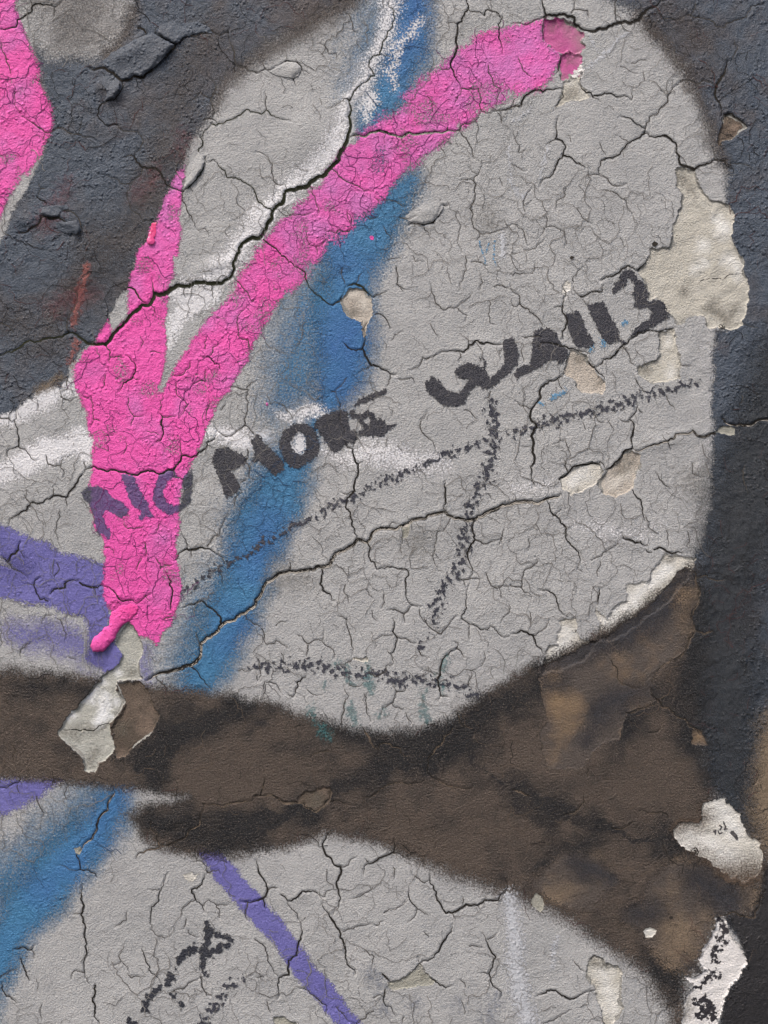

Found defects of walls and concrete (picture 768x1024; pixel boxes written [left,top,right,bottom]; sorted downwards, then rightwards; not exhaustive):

peeling [718,114,747,146]
peeling [340,288,373,337]
crack [0,0,768,809]
peeling [563,350,605,395]
peeling [560,450,641,498]
spalling [637,167,749,384]
spalling [58,603,160,773]
crack [0,716,605,1024]
peeling [524,798,764,1024]
crack [558,843,765,1024]